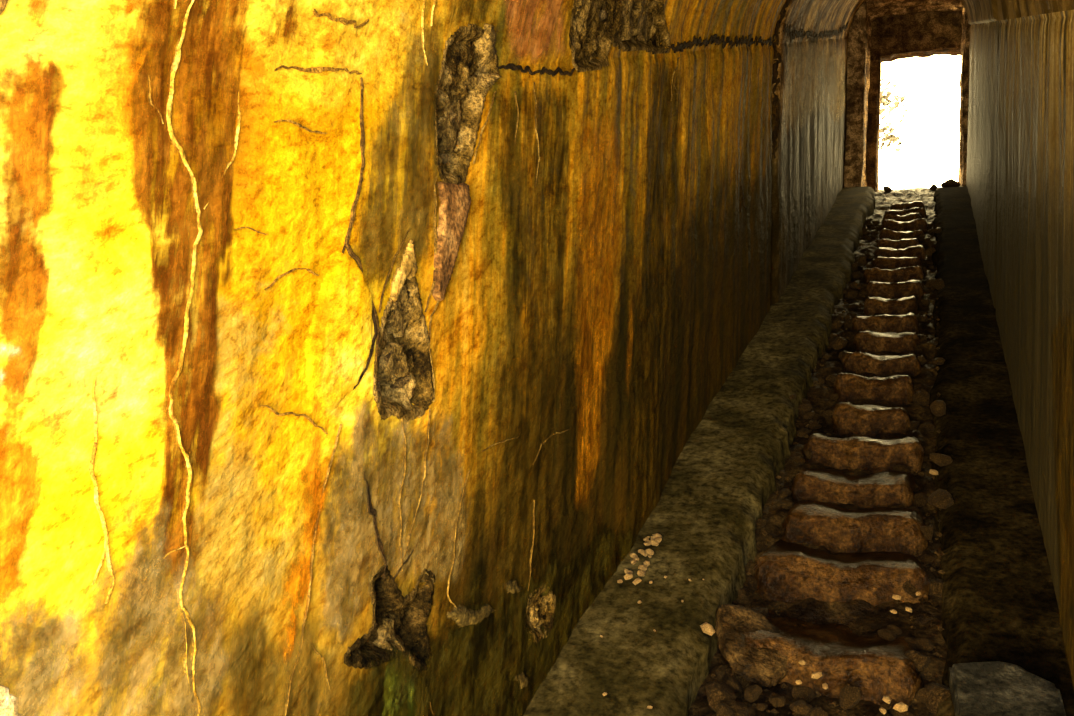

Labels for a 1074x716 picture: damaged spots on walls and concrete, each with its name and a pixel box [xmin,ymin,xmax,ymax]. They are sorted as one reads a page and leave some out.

crack [0,0,8,14]
rust [0,55,58,402]
rust [121,56,144,137]
crack [225,90,241,173]
spalling [373,24,501,422]
spalling [569,0,671,72]
crack [141,0,208,716]
rust [0,424,40,617]
crack [89,376,115,604]
spalling [344,564,435,671]